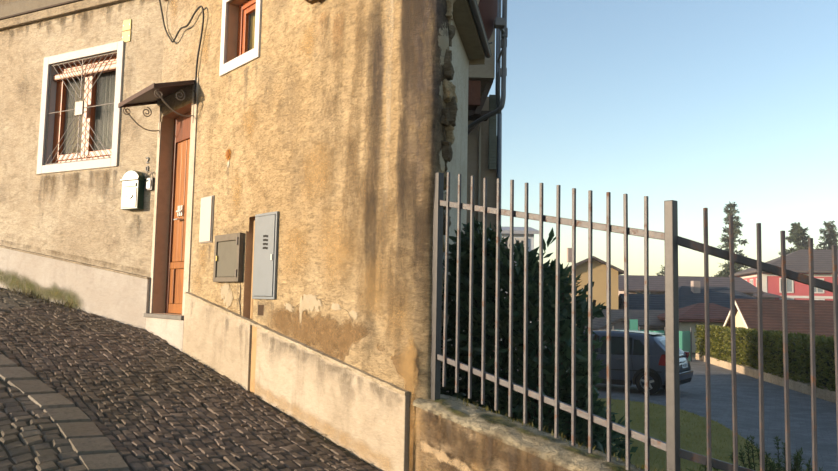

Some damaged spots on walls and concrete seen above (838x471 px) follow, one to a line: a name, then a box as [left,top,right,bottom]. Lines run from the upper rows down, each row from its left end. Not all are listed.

water stain [370,6,383,102]
water stain [402,0,447,97]
spalling [438,0,458,289]
flaking render [272,294,367,362]
flaking render [391,340,418,392]